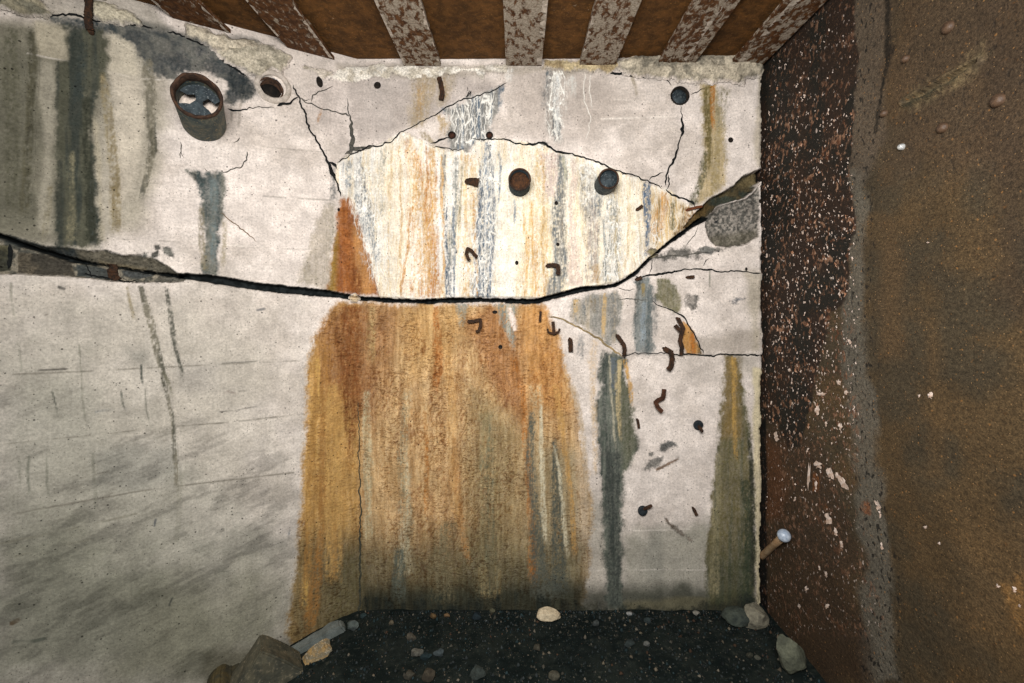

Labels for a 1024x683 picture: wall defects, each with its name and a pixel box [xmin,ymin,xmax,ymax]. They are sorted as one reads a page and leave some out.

damp [0,13,262,254]
damp [182,167,229,275]
crack [0,72,761,357]
rust [282,195,598,646]
damp [294,66,761,611]